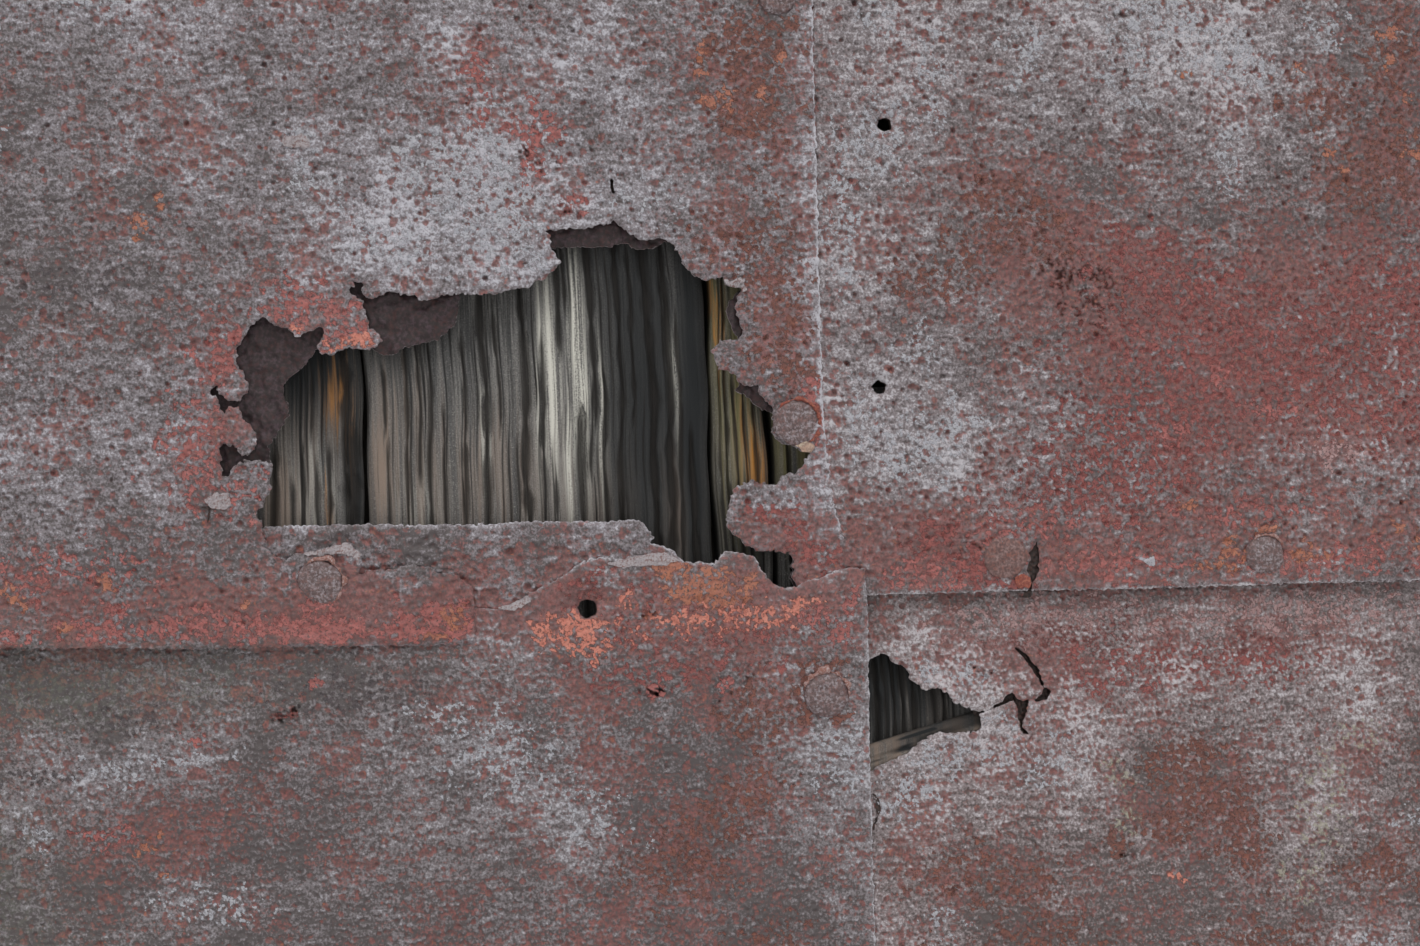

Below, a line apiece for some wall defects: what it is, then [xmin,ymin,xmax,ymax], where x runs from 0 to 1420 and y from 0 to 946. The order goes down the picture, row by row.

rust [686,3,823,447]
rust [744,0,1420,708]
rust [0,532,474,647]
rust [526,561,861,928]
crack [973,647,1051,734]
rust [1188,884,1330,946]
rust [1320,836,1420,903]